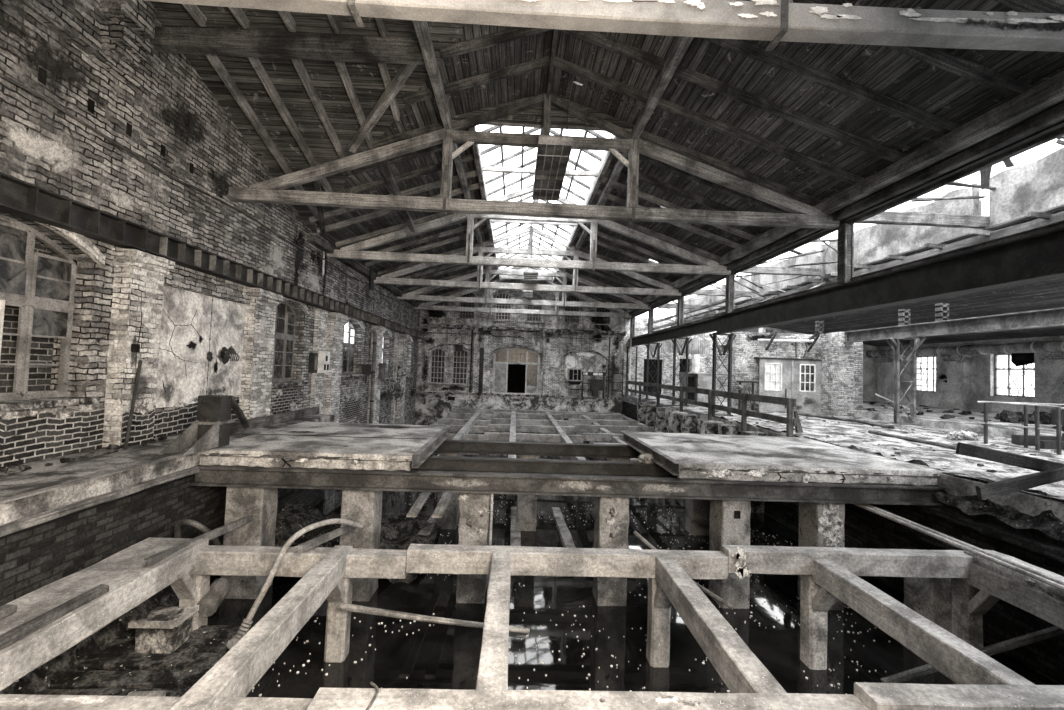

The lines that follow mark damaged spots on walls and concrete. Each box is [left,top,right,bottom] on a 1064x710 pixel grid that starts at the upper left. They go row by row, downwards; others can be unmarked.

peeling [730,0,779,18]
peeling [808,3,862,20]
peeling [898,8,1064,24]
leakage [965,17,1064,31]
leakage [152,99,205,146]
leakage [207,168,233,198]
crack [135,295,203,389]
spalling [712,417,996,484]
spalling [764,501,799,533]
spalling [844,485,1064,577]
spalling [873,576,904,594]
spalling [983,599,1064,685]